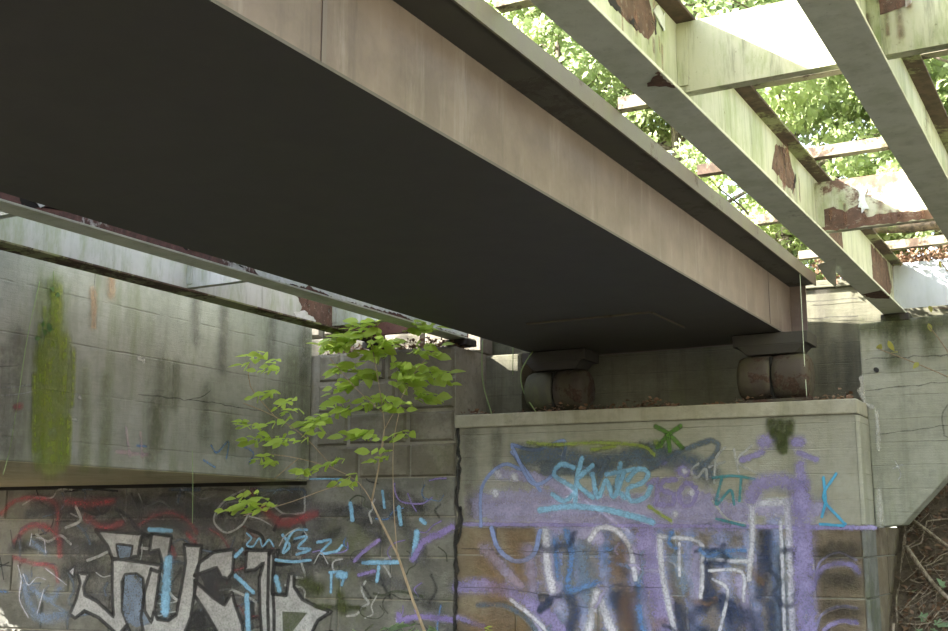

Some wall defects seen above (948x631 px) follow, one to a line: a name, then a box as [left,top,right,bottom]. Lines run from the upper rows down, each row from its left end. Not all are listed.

corrosion [866,0,912,37]
corrosion [822,185,933,231]
leakage [33,280,76,472]
leakage [767,419,795,454]
crack [453,428,663,631]